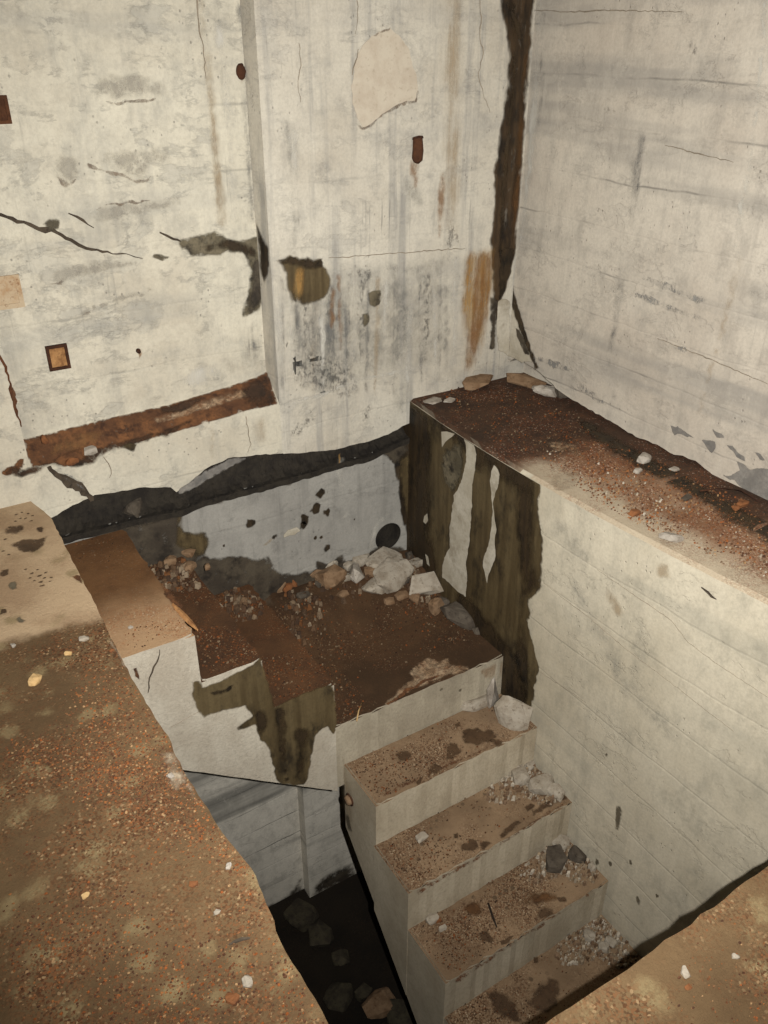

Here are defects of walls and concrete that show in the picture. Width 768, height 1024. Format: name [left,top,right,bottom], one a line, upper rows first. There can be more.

leakage [491,0,537,319]
crack [0,213,143,259]
spalling [180,227,269,316]
rust [453,253,492,351]
crack [512,291,538,369]
rust [0,355,277,477]
spalling [179,458,245,494]
peeling [671,426,768,500]
leakage [95,517,345,601]
leakage [369,402,543,706]
leakage [192,658,337,785]